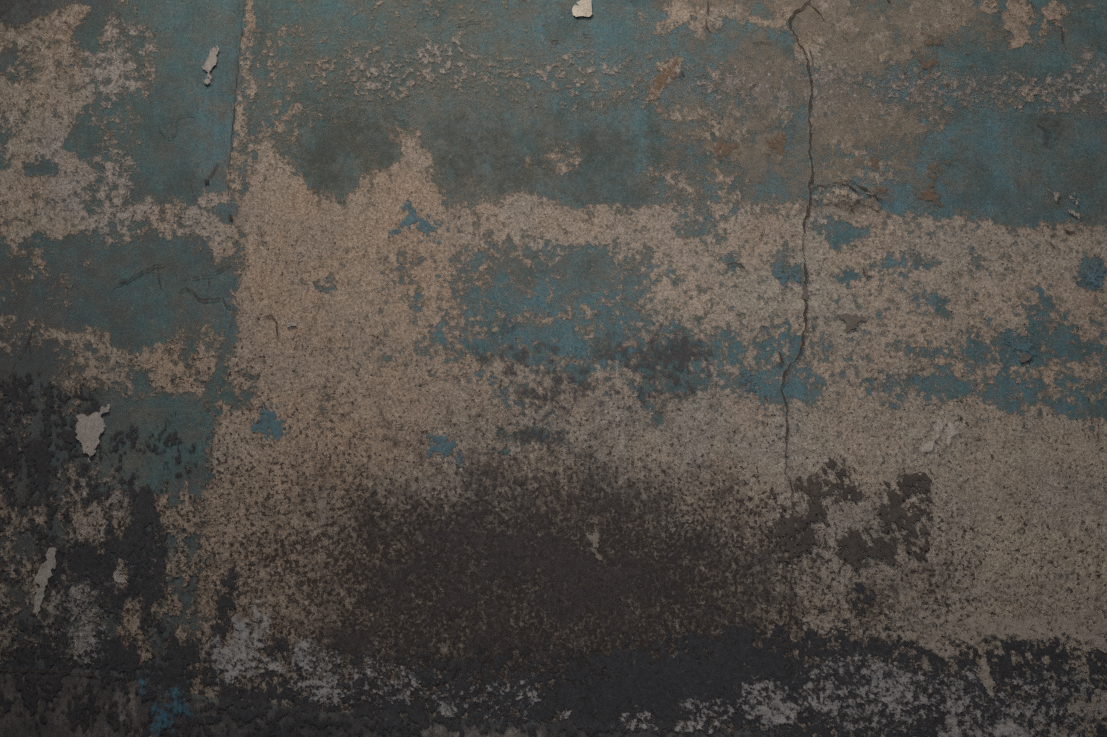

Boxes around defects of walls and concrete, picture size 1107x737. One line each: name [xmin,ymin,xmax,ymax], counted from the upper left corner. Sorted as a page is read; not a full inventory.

spalling [567,0,592,24]
peeling [979,0,1073,50]
spalling [202,46,219,84]
peeling [524,142,583,176]
crack [756,0,886,673]
water stain [0,343,1107,737]